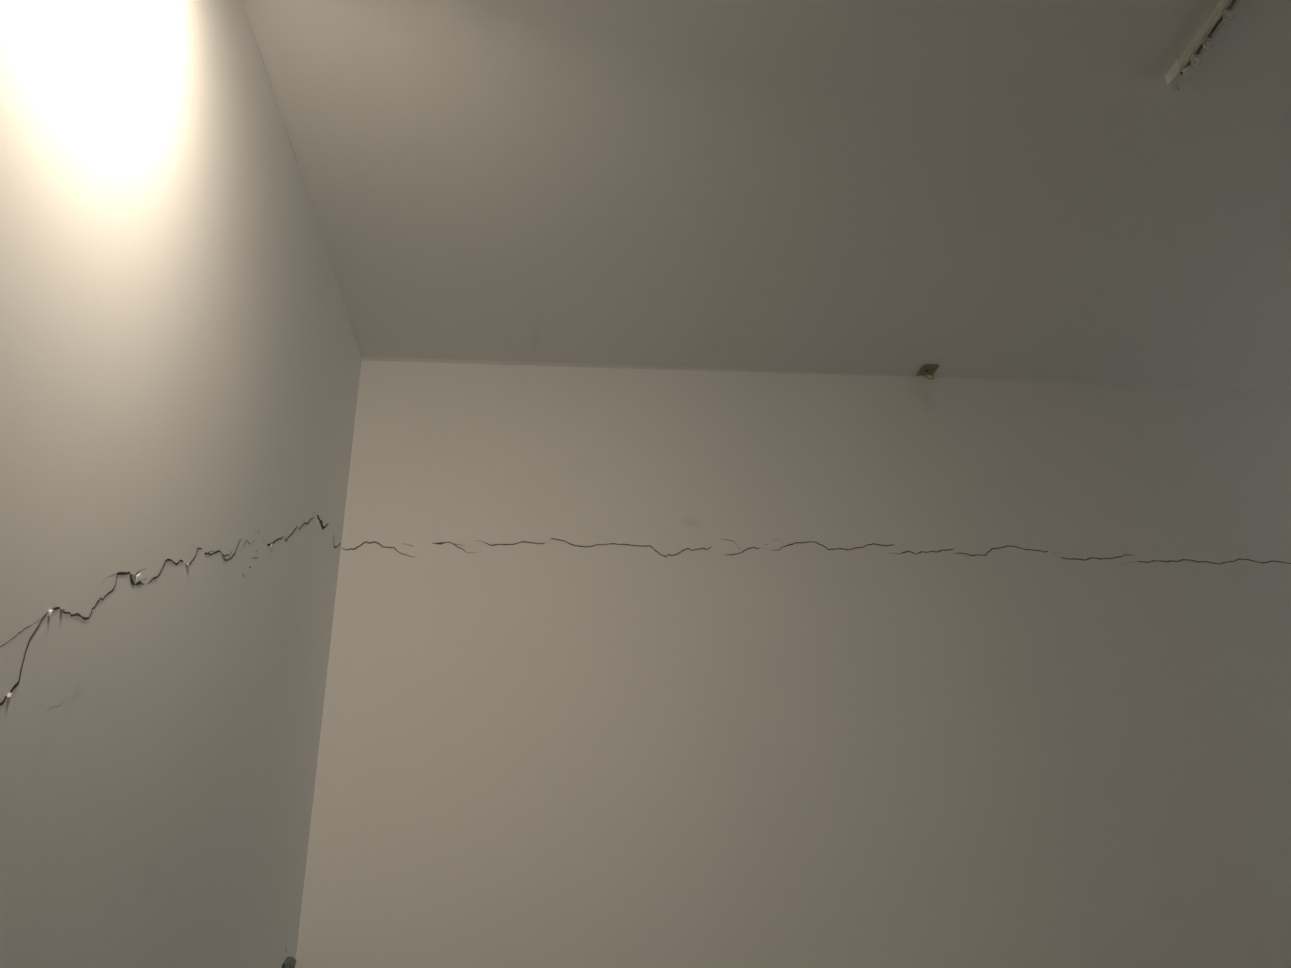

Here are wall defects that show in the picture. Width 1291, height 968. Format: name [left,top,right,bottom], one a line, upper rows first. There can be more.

crack [0,514,1291,706]